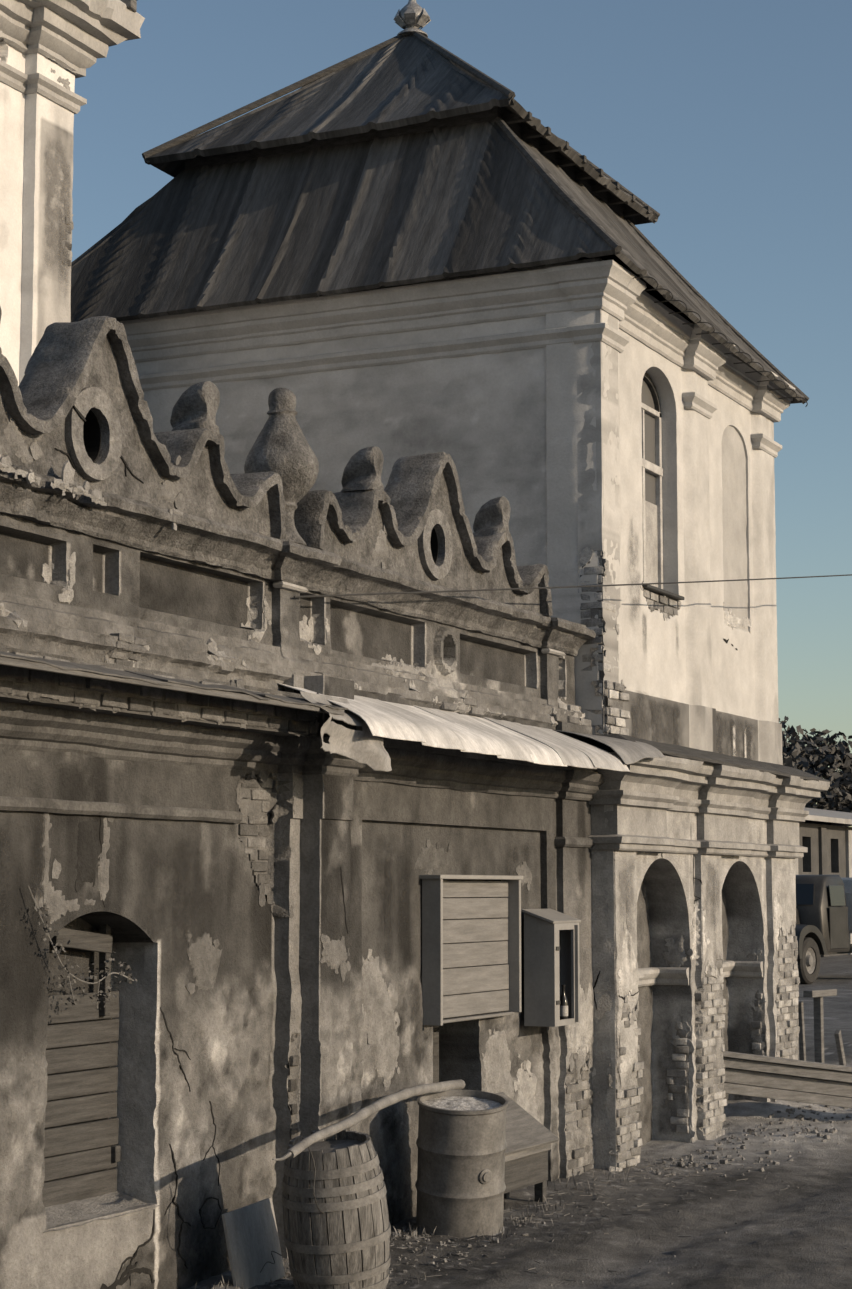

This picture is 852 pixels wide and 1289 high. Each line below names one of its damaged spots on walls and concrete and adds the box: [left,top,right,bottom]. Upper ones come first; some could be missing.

flaking render [0,603,28,628]
flaking render [41,552,76,604]
flaking render [0,633,321,737]
flaking render [240,596,272,643]
flaking render [548,547,630,735]
flaking render [640,585,680,621]
peeling [34,812,115,924]
flaking render [565,914,644,1177]
flaking render [661,901,727,1143]
flaking render [743,893,800,1060]
crack [100,1007,222,1289]